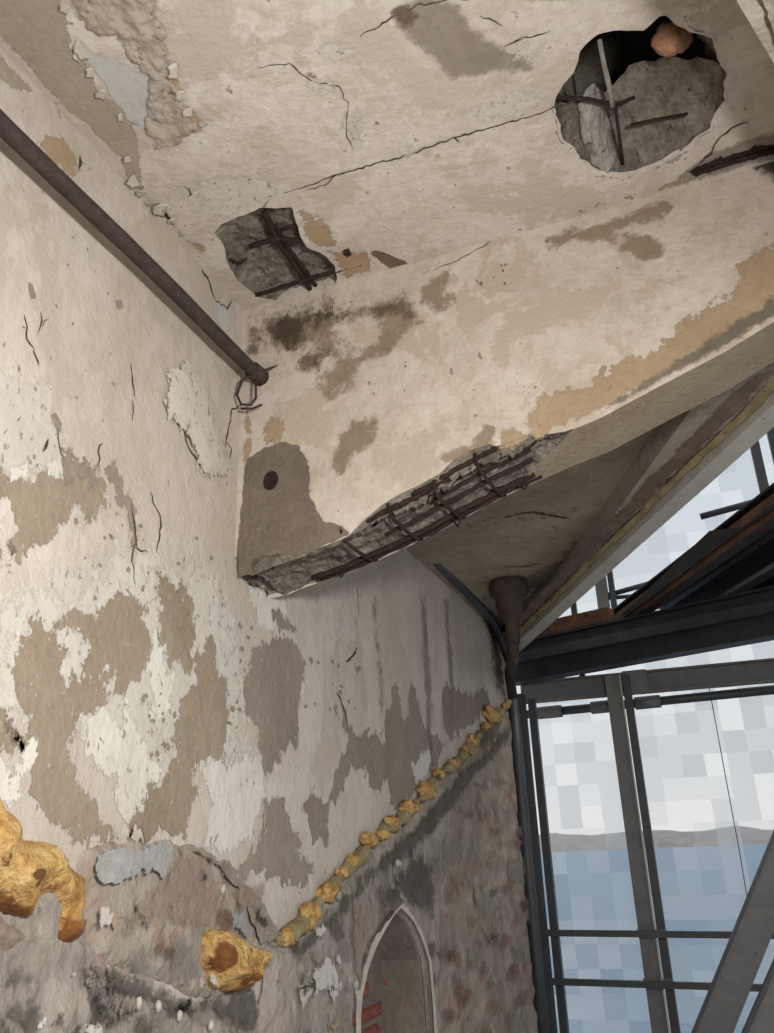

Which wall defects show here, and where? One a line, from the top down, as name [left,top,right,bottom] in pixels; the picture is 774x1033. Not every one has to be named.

crack [360,0,550,47]
crack [757,0,774,45]
flaking render [0,0,211,257]
spalling [215,207,362,300]
crack [257,63,603,217]
water stain [545,176,692,260]
spalling [689,144,774,177]
water stain [247,272,455,399]
spalling [248,244,774,596]
peeling [0,413,144,566]
crack [131,492,162,584]
flaking render [0,571,538,1033]